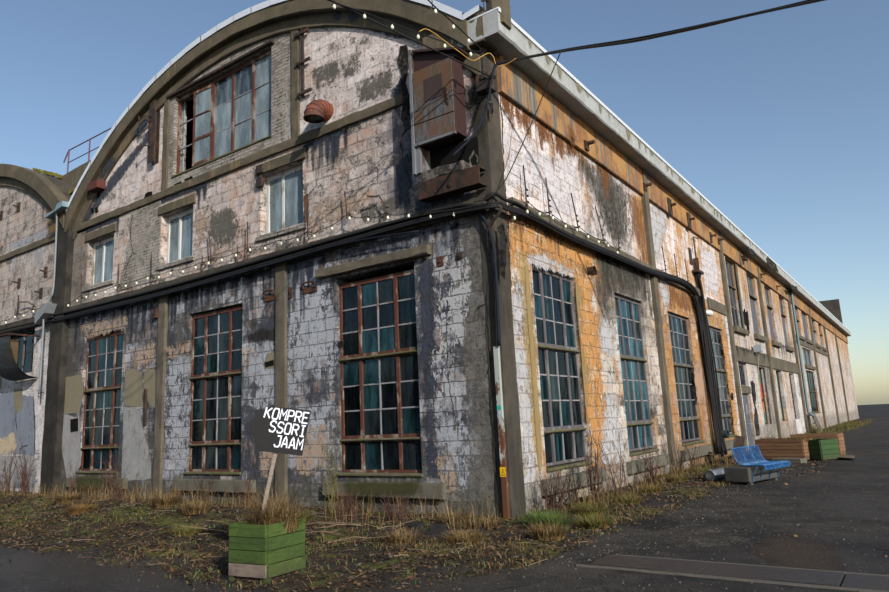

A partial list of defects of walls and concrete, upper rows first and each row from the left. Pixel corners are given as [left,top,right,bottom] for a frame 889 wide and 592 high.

spalling [398,45,411,132]
damp [303,128,347,166]
corrosion [501,95,609,199]
corrosion [509,217,579,253]
damp [581,161,633,245]
corrosion [669,284,695,314]
peeling [0,432,17,455]
peeling [164,352,192,476]
peeling [244,337,275,410]
peeling [287,263,344,470]
peeling [431,254,475,494]
peeling [601,388,624,465]